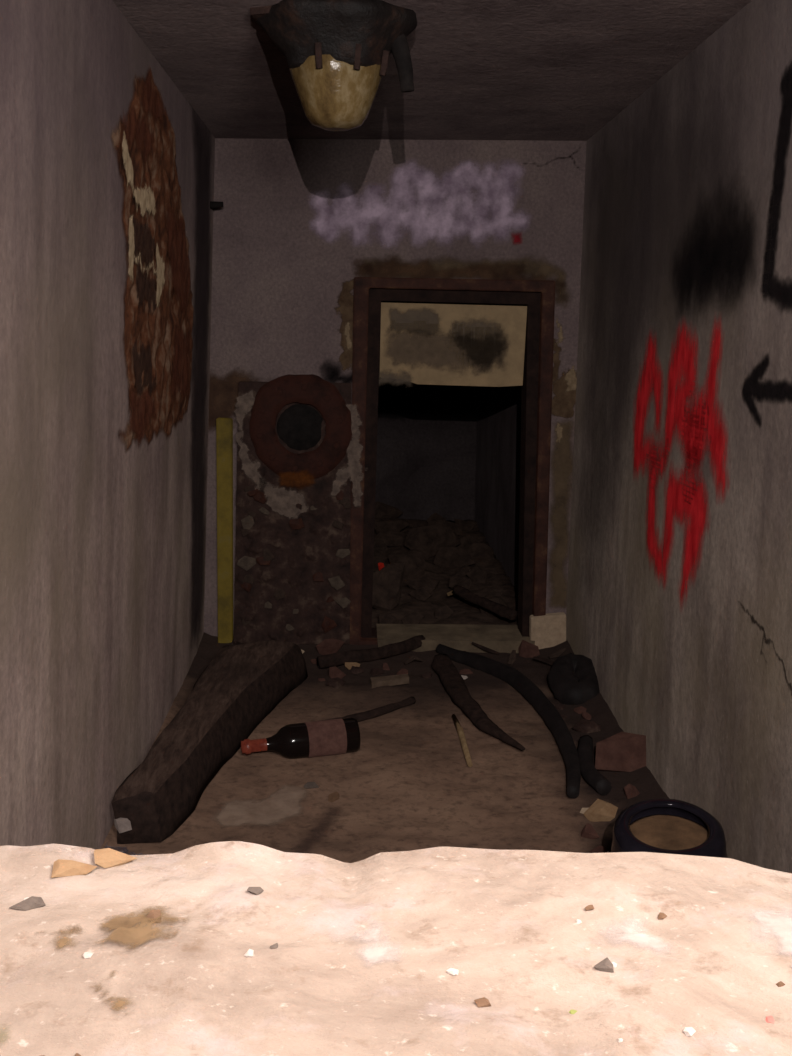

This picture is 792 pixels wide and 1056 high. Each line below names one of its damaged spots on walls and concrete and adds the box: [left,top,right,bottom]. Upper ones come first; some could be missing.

crack [742,605,792,690]